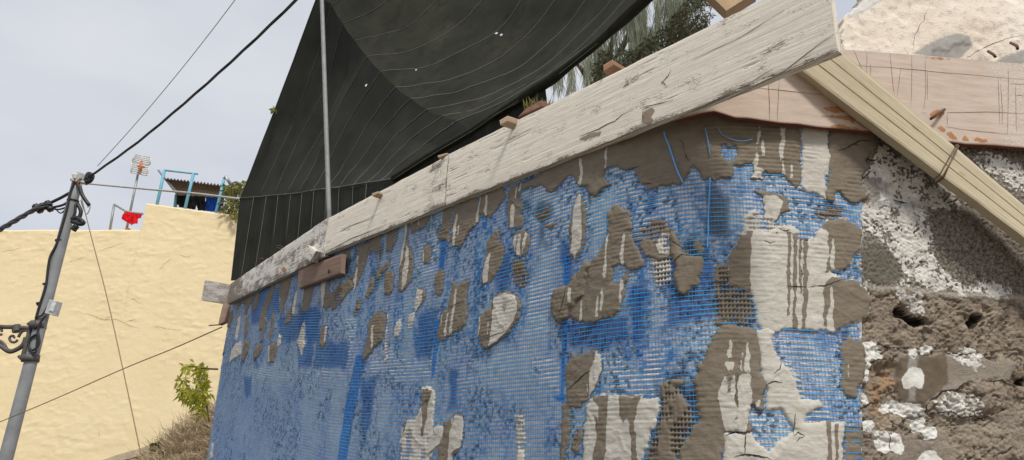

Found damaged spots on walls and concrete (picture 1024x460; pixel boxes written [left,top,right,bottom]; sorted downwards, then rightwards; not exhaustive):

crack [854,5,1022,134]
peeling [861,145,1012,330]
peeling [971,151,1024,197]
peeling [860,341,985,460]